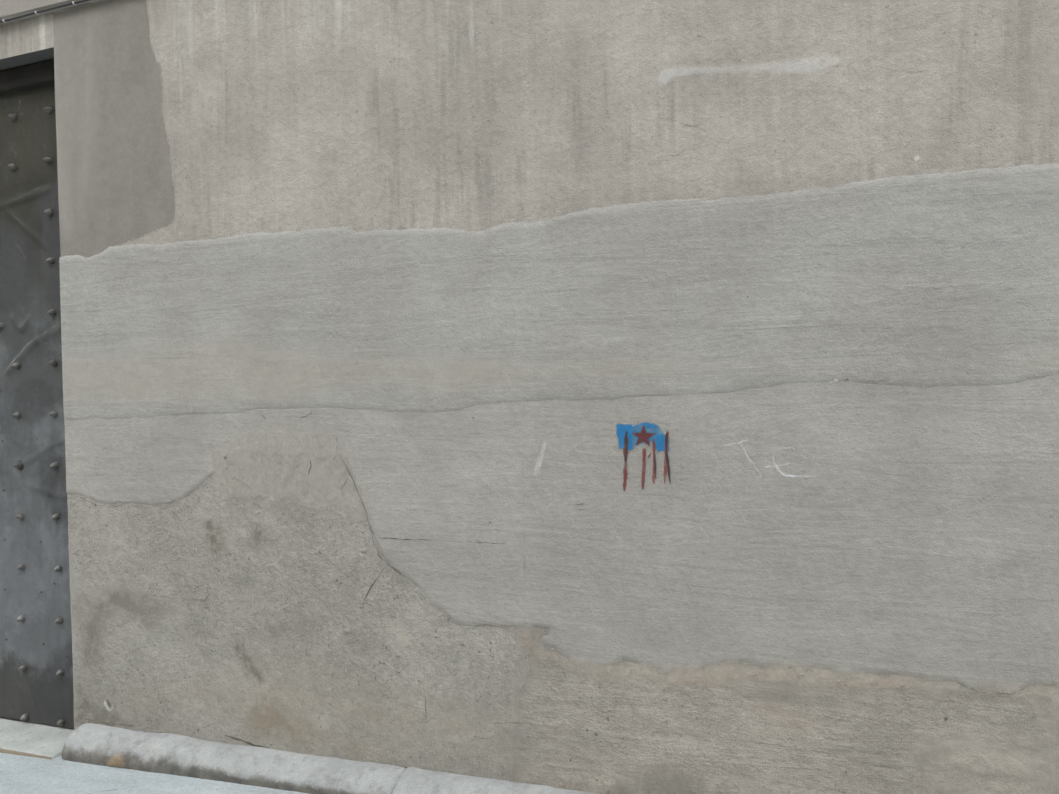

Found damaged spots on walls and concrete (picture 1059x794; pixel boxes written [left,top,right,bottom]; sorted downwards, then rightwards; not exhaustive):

crack [290,439,426,608]